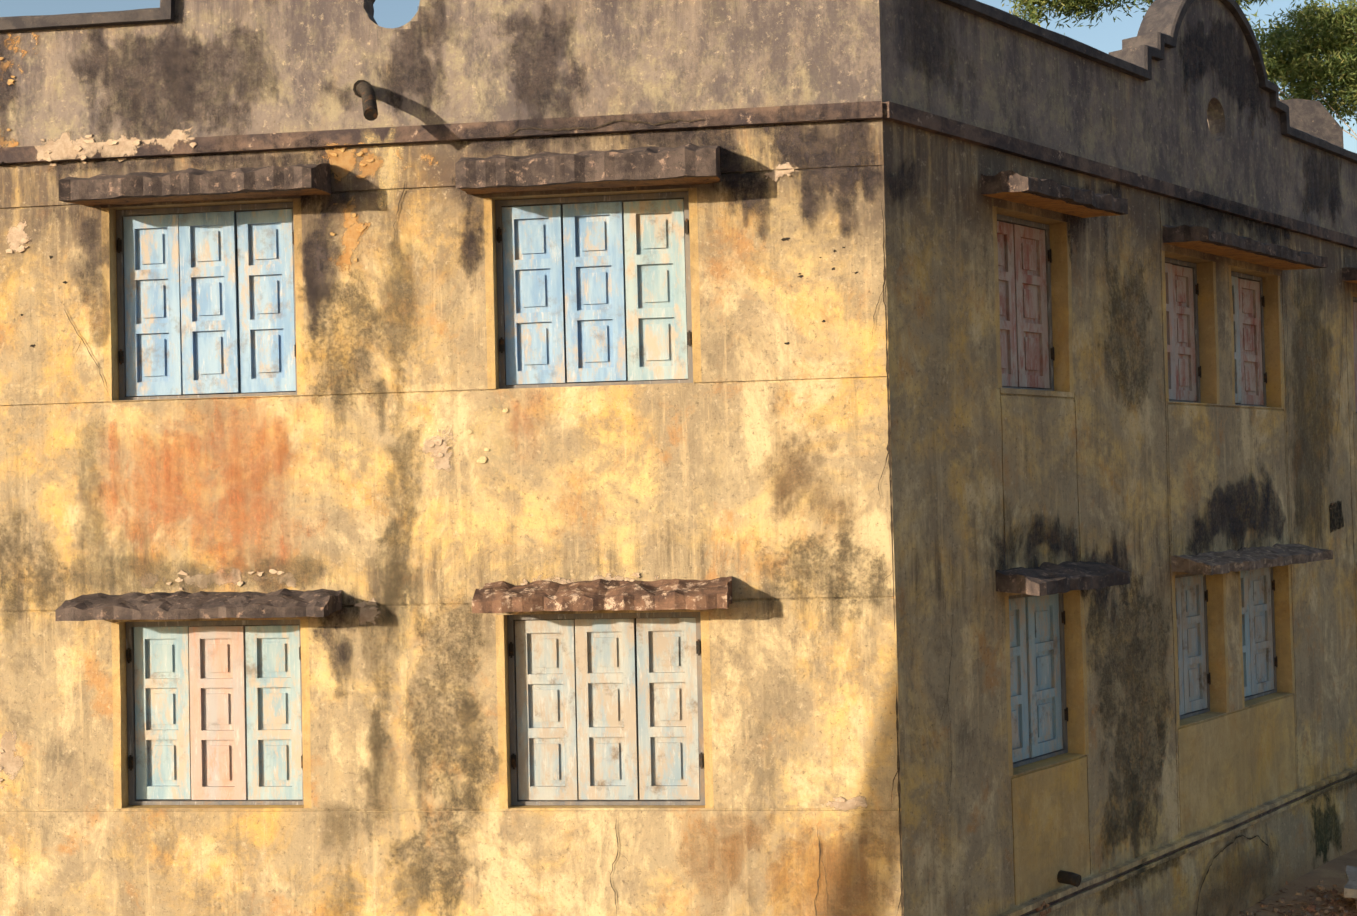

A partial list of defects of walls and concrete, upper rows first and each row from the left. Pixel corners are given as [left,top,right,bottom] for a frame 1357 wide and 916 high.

flaking render [0,33,39,85]
flaking render [0,126,198,166]
leakage [301,193,346,331]
leakage [455,187,482,267]
leakage [461,6,768,237]
leakage [757,102,882,235]
crack [871,198,895,629]
leakage [365,432,418,696]
leakage [1190,468,1285,555]
leakage [369,714,386,759]